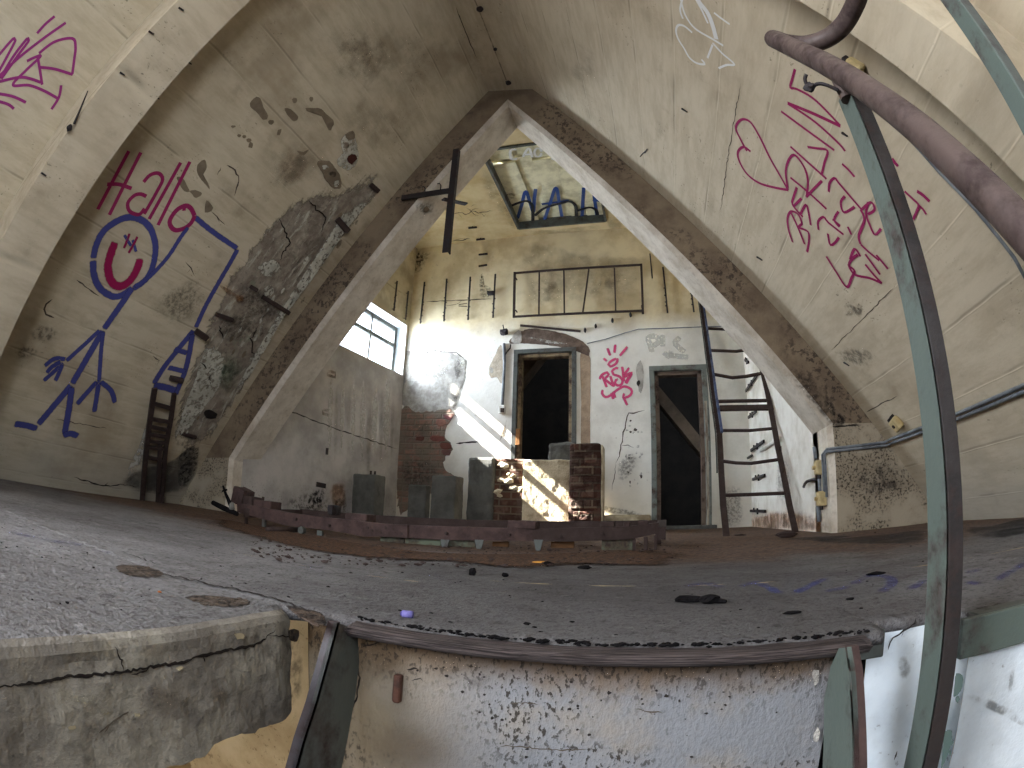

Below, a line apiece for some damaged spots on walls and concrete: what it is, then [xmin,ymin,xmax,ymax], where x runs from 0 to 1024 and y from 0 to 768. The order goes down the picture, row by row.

peeling [250,97,281,135]
peeling [285,97,334,130]
spalling [174,131,376,446]
damp [798,374,844,427]
damp [127,431,198,492]
spalling [397,351,467,514]
crack [612,410,644,485]
crack [0,631,289,688]